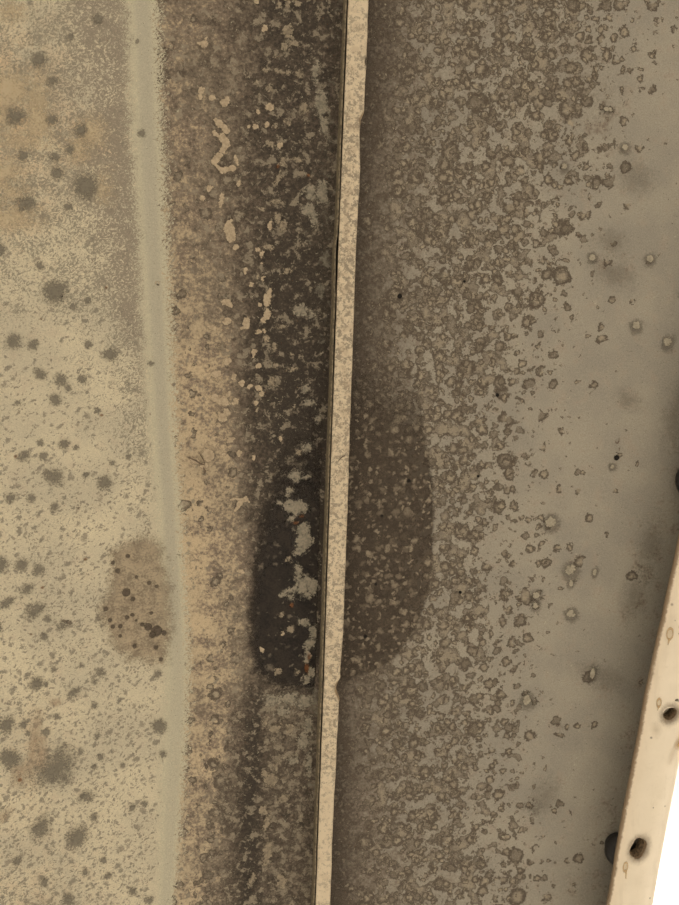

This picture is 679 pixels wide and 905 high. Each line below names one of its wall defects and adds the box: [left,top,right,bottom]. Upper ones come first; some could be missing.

leakage [100,540,171,677]
leakage [248,416,321,690]
leakage [339,377,433,680]